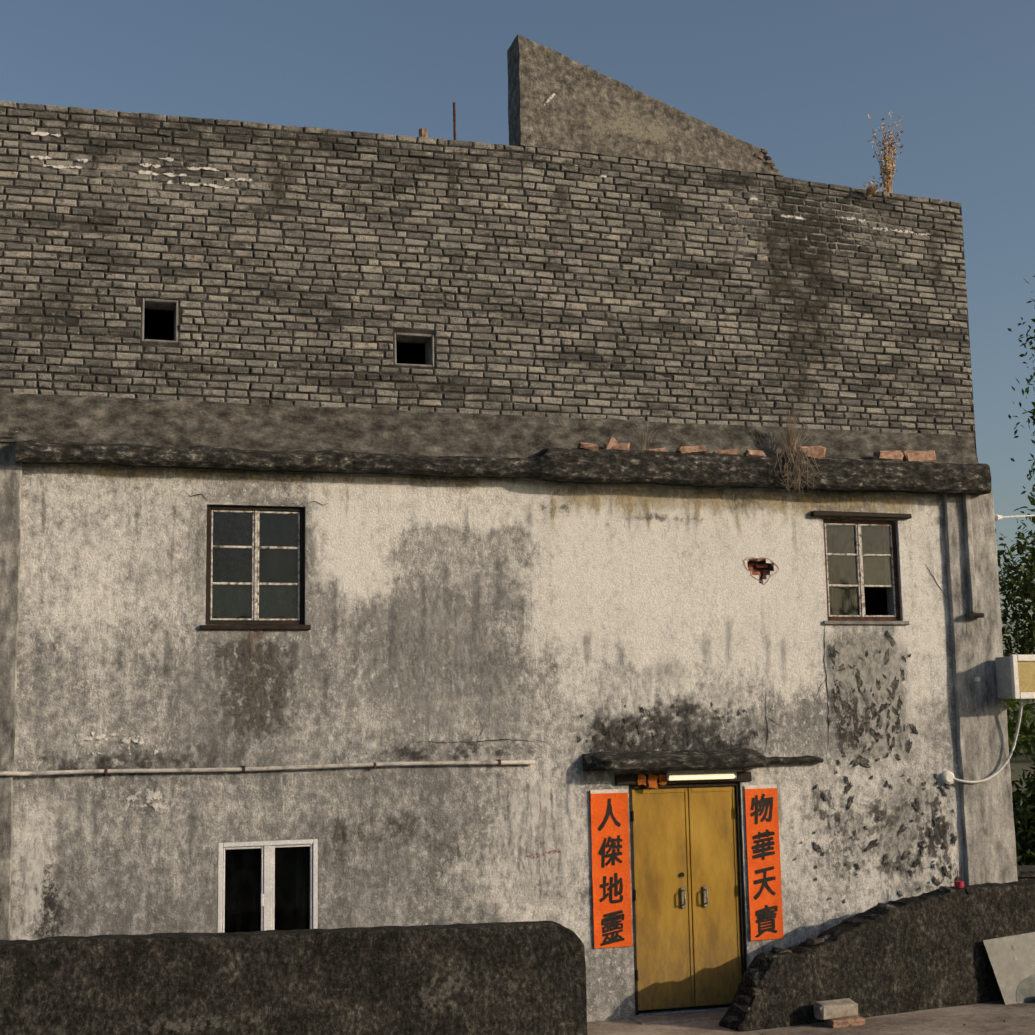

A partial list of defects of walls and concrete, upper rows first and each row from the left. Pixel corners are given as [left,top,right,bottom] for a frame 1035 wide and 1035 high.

damp [542,488,910,526]
spalling [743,557,779,585]
damp [216,639,297,743]
damp [375,745,437,761]
damp [450,737,482,759]
damp [576,699,768,753]
peeling [828,630,918,810]
peeling [850,774,963,894]